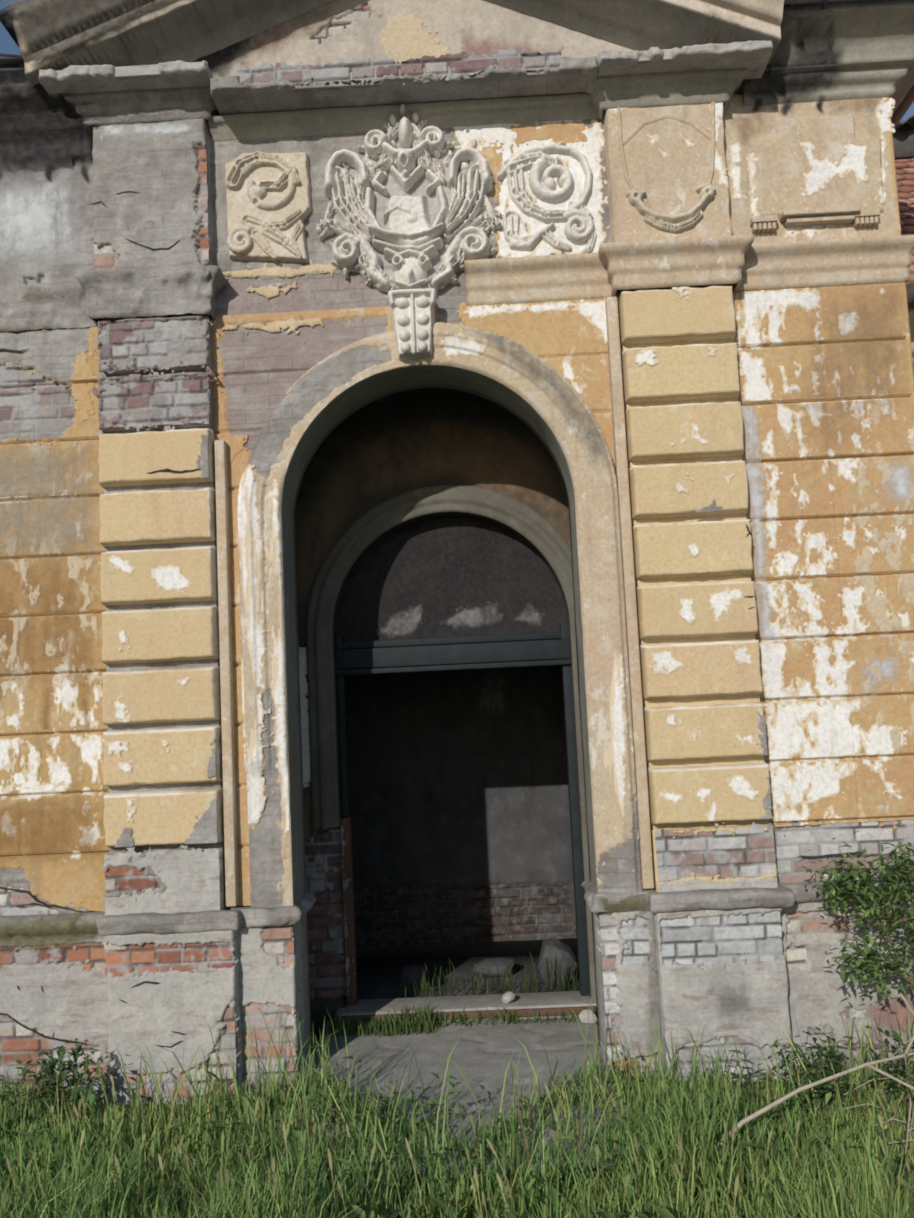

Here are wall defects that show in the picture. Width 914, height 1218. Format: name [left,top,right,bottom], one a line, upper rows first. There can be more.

leakage [779,4,797,51]
peeling [794,97,895,211]
peeling [436,294,619,365]
flaking render [0,263,392,916]
peeling [649,287,914,892]
peeling [597,653,642,898]
crack [0,986,95,1046]
crack [0,887,101,913]
flaking render [0,941,234,977]
flaking render [0,999,298,1105]
flaking render [261,826,576,999]
flaking render [599,904,914,1083]